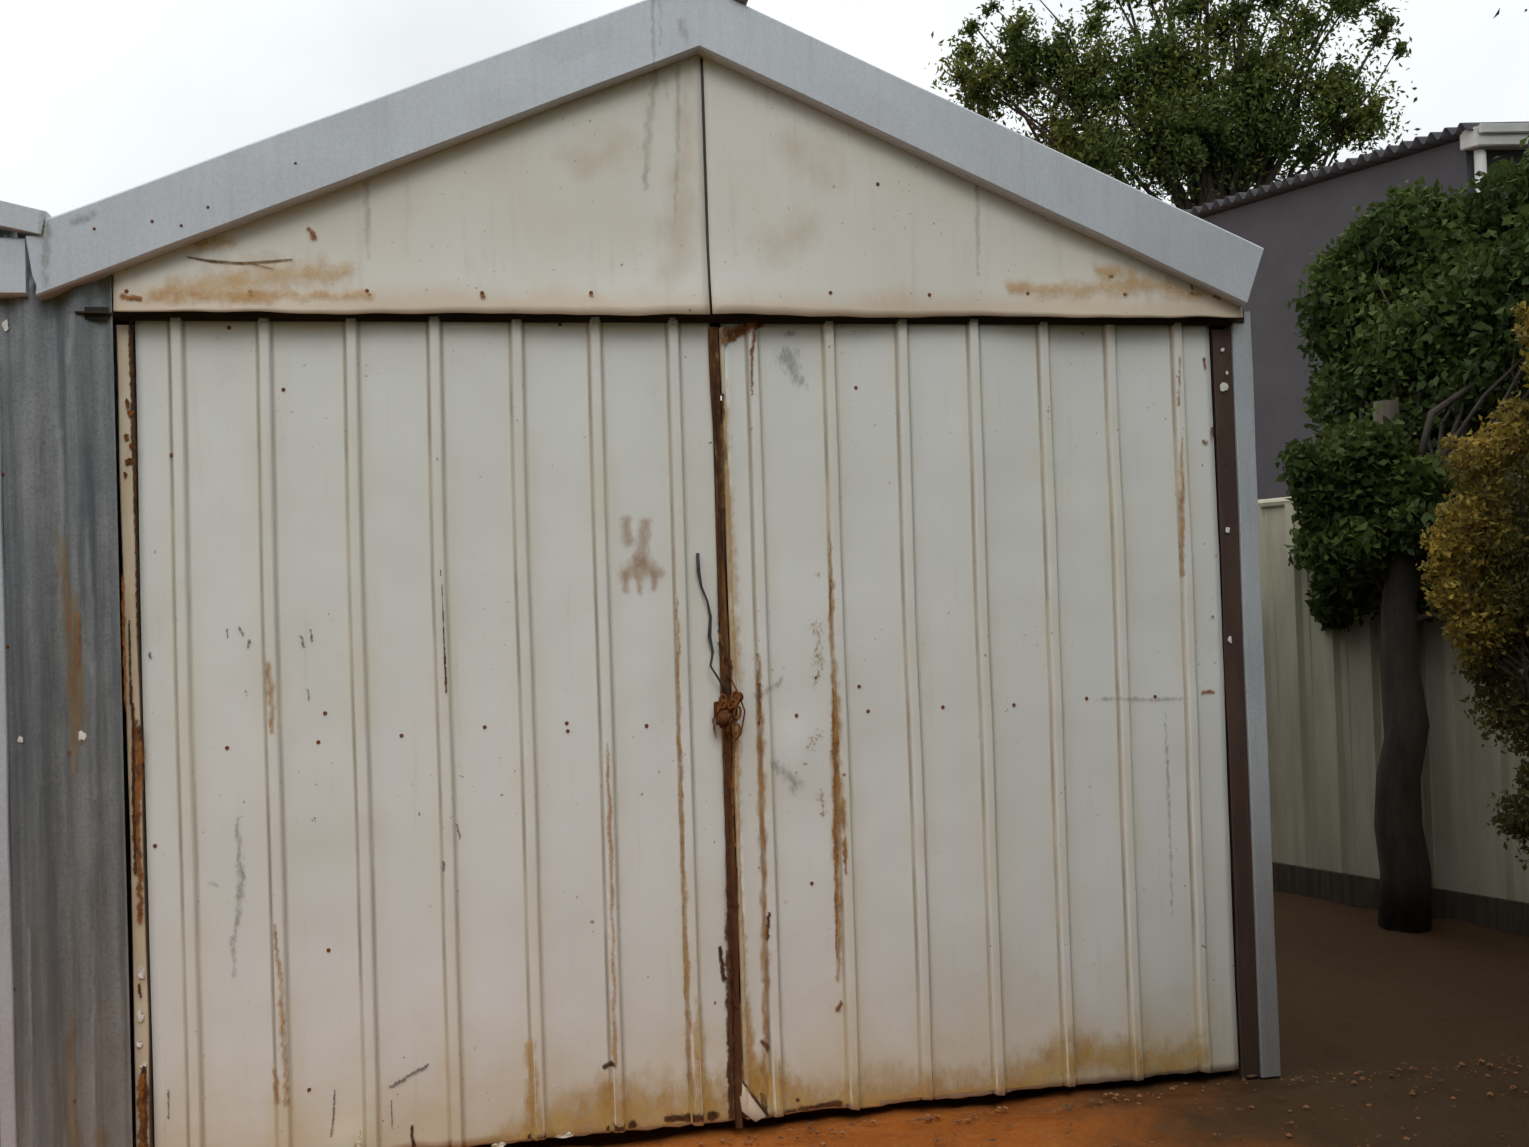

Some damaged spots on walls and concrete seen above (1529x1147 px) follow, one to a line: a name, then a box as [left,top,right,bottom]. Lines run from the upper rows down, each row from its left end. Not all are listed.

corrosion [120,294,144,924]
corrosion [136,1066,150,1147]
corrosion [274,998,288,1101]
corrosion [709,320,763,699]
corrosion [664,718,842,1123]
corrosion [756,654,766,882]
corrosion [807,543,847,980]